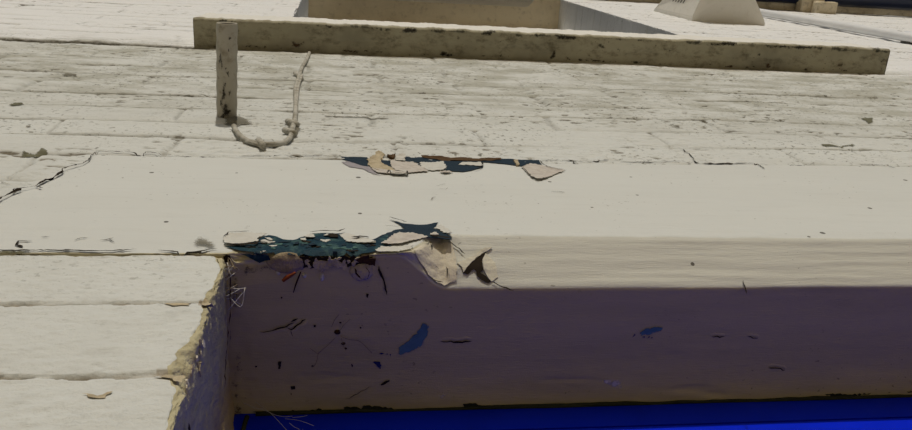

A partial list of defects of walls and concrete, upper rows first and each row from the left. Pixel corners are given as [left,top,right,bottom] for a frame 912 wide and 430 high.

crack [0,151,327,199]
peeling [341,150,566,180]
crack [5,236,131,251]
crack [163,248,216,256]
peeling [223,217,452,274]